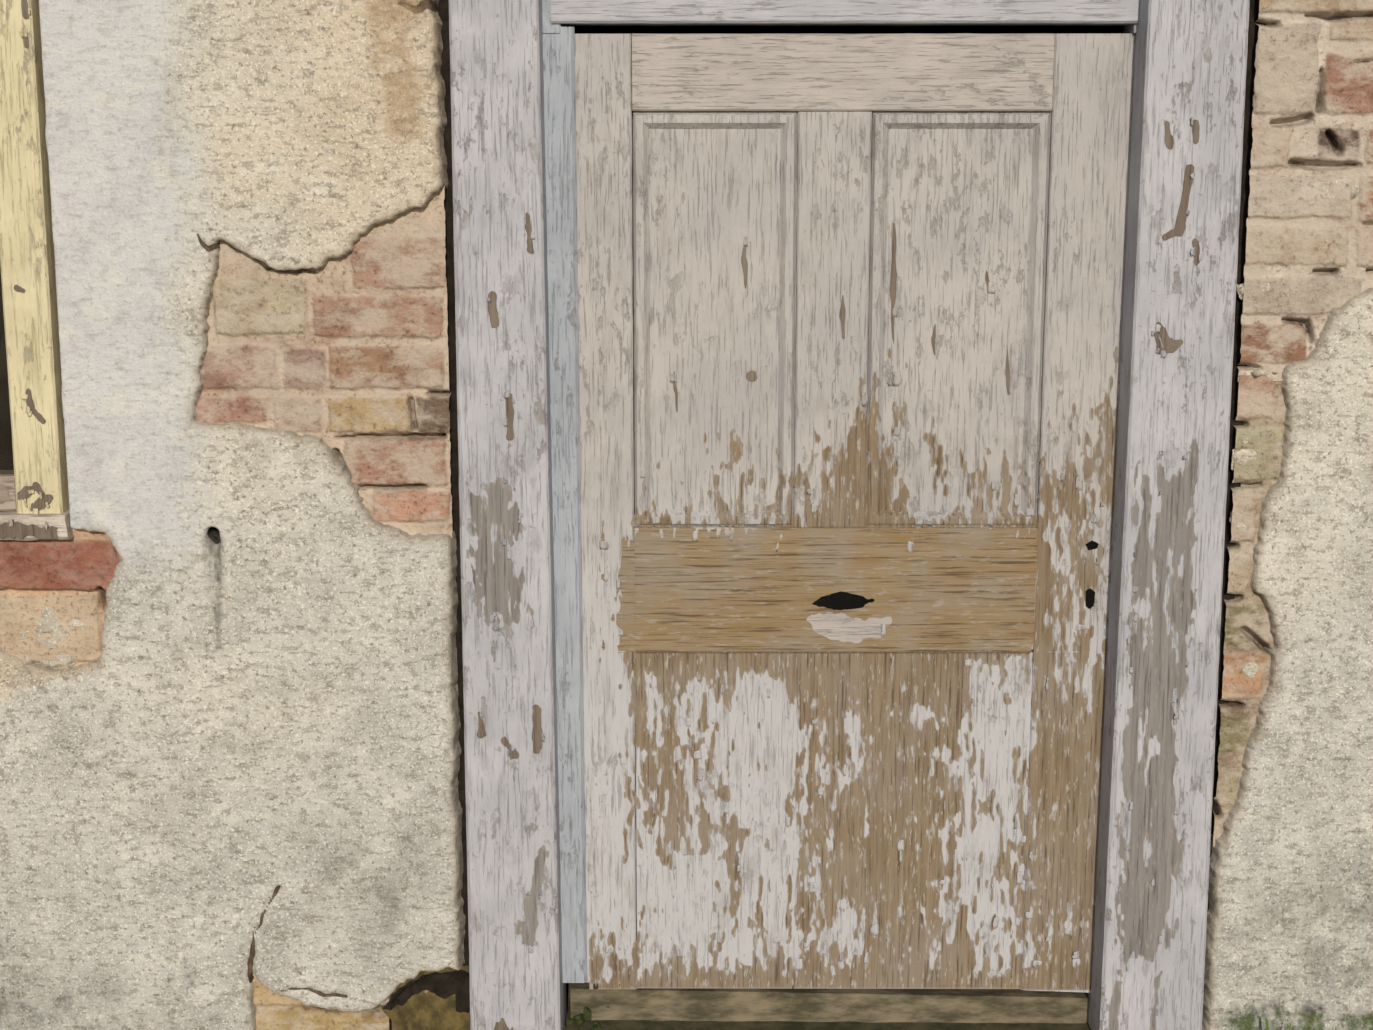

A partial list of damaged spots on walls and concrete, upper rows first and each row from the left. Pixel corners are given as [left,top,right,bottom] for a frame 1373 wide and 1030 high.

peeling [525,212,535,254]
peeling [487,291,499,328]
spalling [194,184,453,537]
peeling [503,390,515,441]
spalling [1213,0,1373,847]
spalling [0,482,121,669]
peeling [466,477,535,631]
spalling [253,965,471,1030]
peeling [494,1018,513,1030]